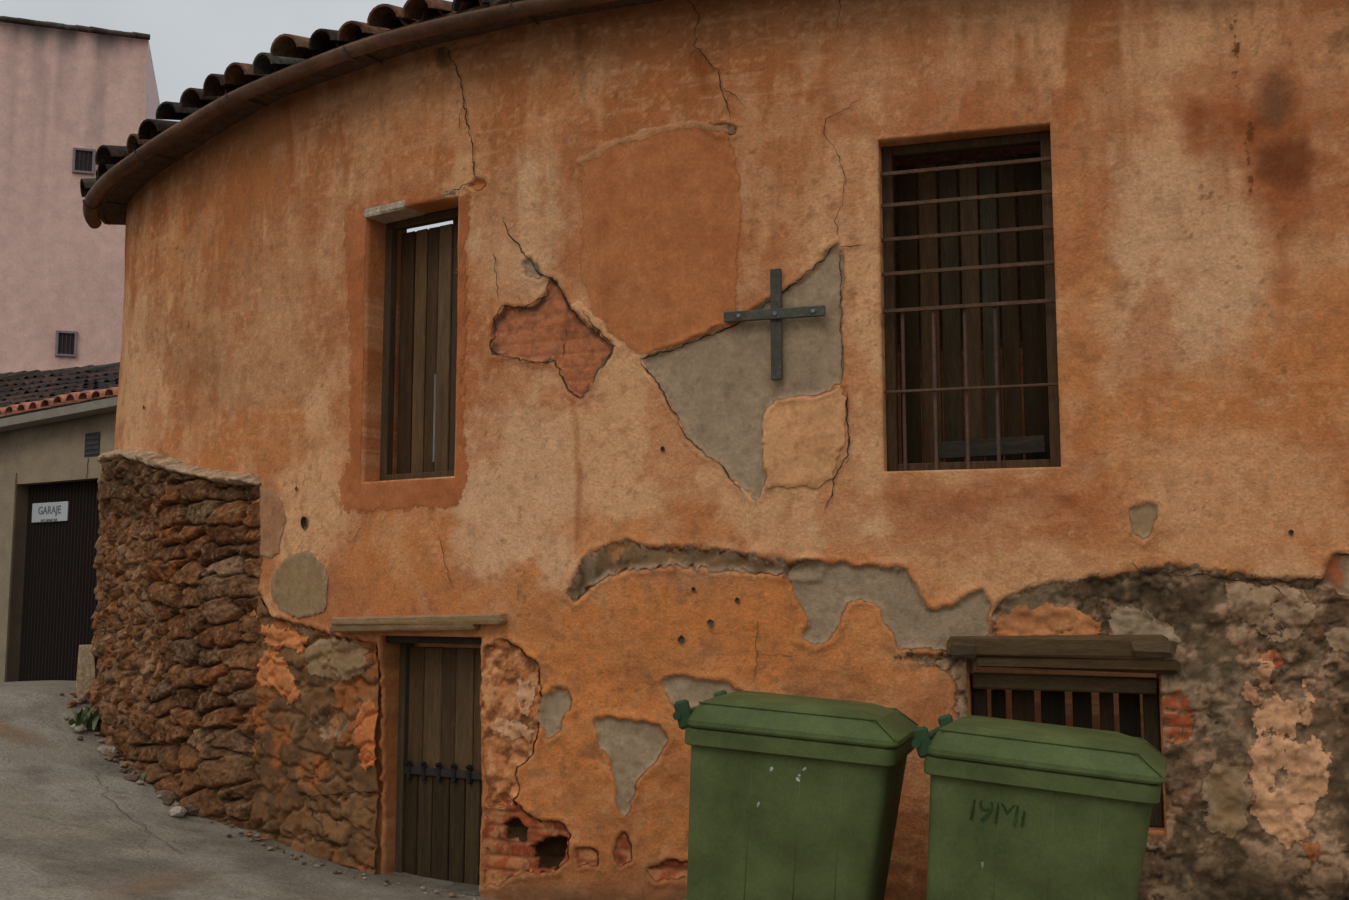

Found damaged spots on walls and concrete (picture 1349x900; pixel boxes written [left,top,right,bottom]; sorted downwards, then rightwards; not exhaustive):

crack [443,48,477,193]
crack [689,1,744,114]
spalling [490,257,613,397]
crack [489,96,870,507]
peeling [567,538,807,601]
spalling [247,595,380,875]
spalling [480,639,571,887]
spalling [593,716,668,816]
spalling [660,676,737,708]
spalling [894,649,968,720]
spalling [988,561,1349,900]